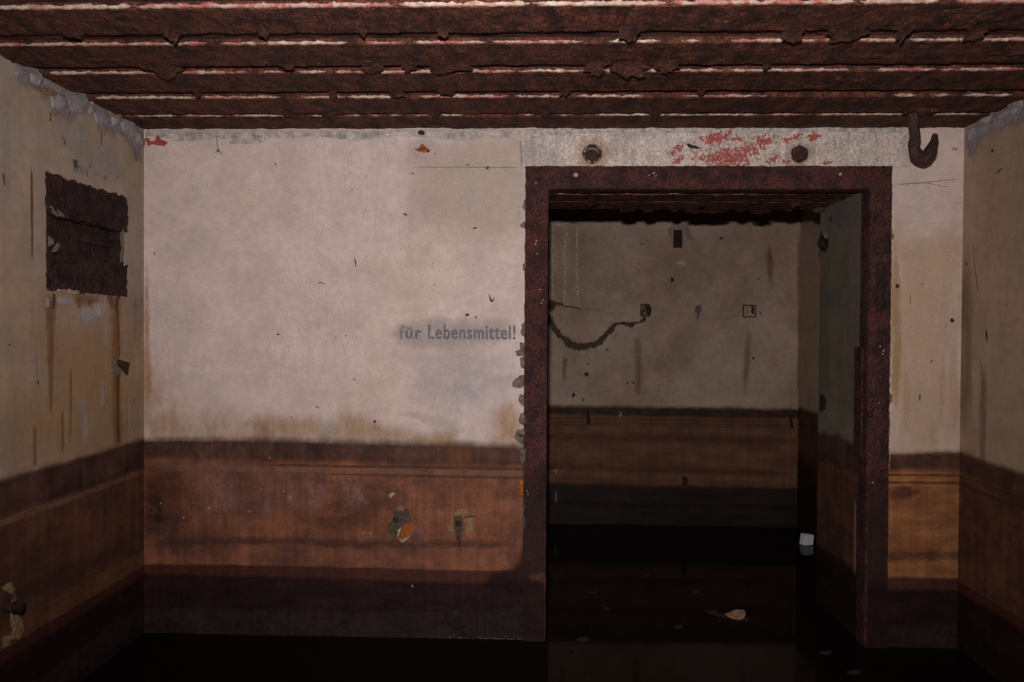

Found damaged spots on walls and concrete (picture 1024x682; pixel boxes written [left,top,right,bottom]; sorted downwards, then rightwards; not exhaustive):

peeling [8,60,911,167]
spalling [966,100,1024,157]
rust [47,294,72,450]
spalling [512,323,526,463]
spalling [2,582,25,648]
leakage [0,440,524,682]
spalling [388,492,416,543]
spalling [448,509,475,546]
leakage [887,453,1024,682]